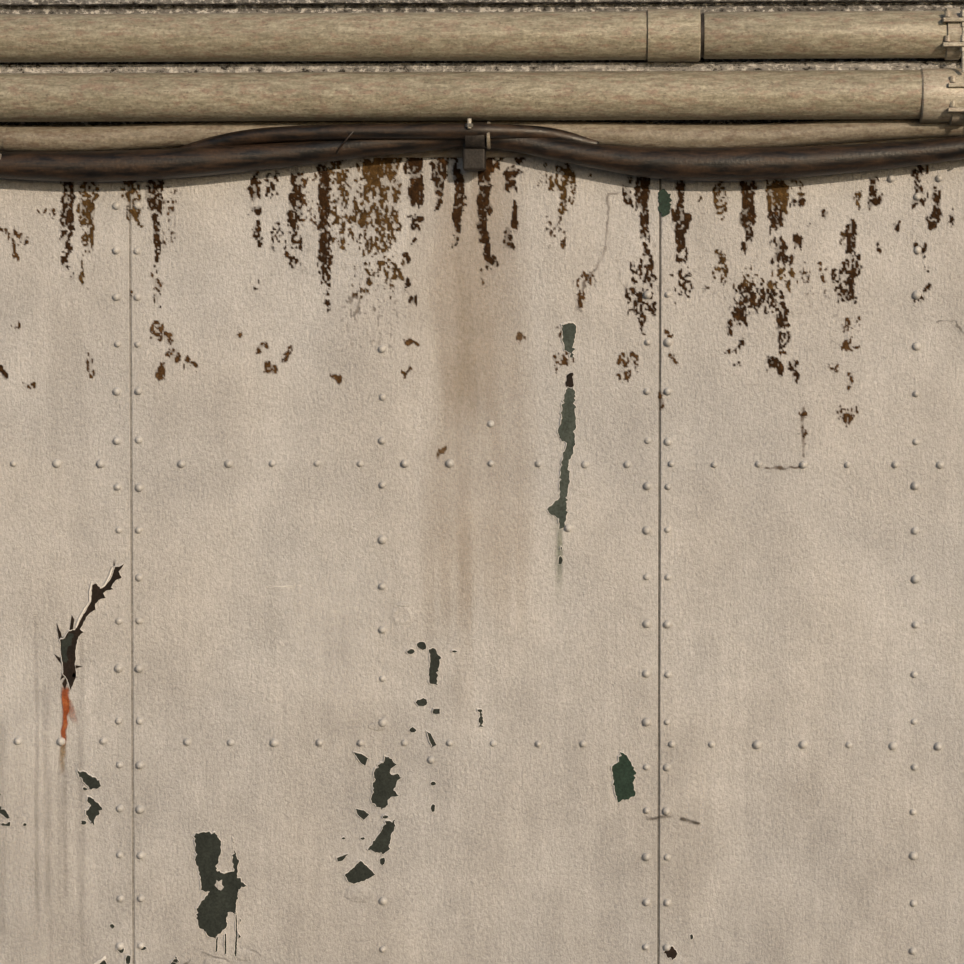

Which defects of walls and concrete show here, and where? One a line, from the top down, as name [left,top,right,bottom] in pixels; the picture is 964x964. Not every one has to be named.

rust [37,181,99,284]
rust [247,157,525,312]
rust [622,177,657,335]
rust [670,180,693,304]
rust [706,179,809,384]
rust [817,176,883,304]
peeling [546,373,577,530]
peeling [405,641,458,685]
peeling [75,768,103,826]
peeling [335,751,402,884]
peeling [610,751,637,803]
peeling [192,831,247,960]